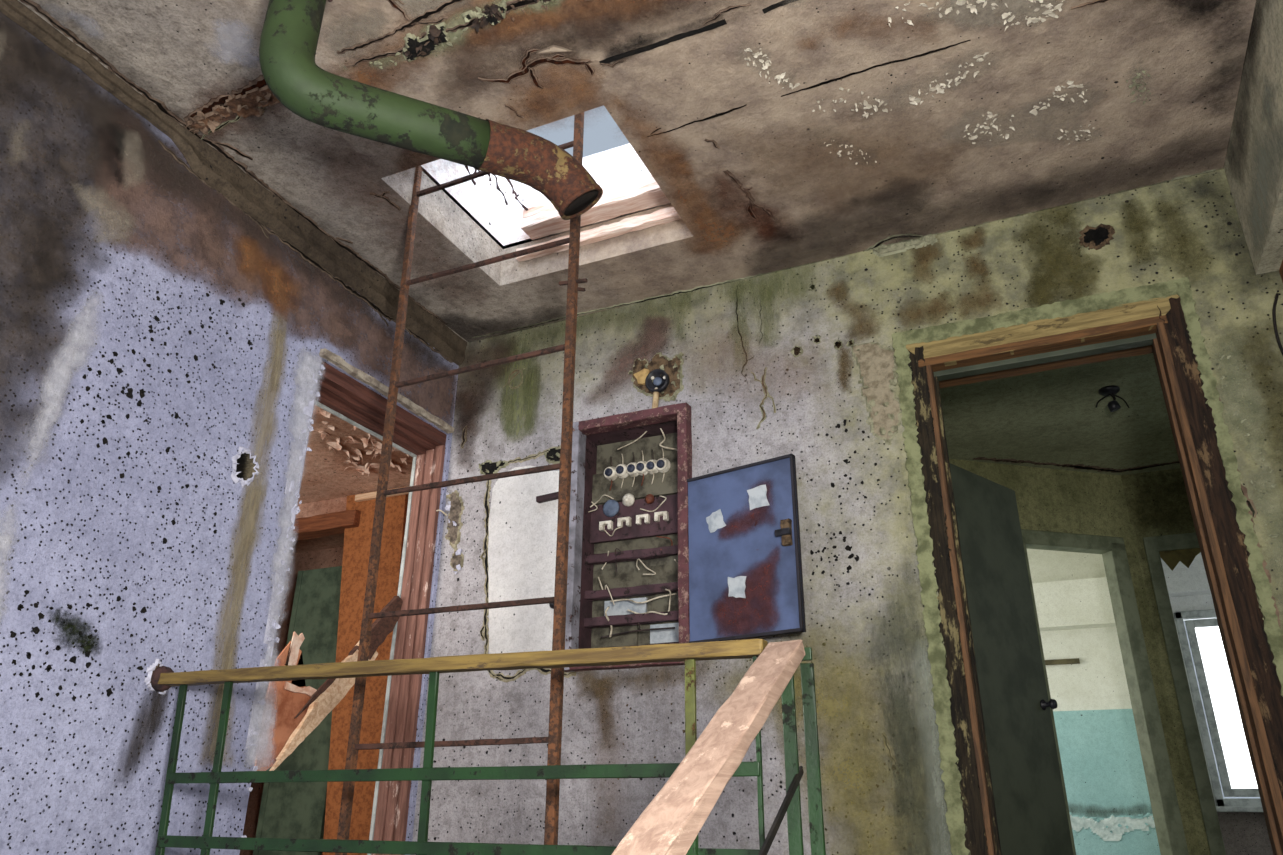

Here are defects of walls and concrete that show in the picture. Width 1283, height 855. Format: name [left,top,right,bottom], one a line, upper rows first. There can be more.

crack [336,0,539,68]
crack [478,47,595,118]
crack [781,40,971,97]
crack [647,104,775,220]
flaking render [188,293,245,340]
damp [901,230,995,323]
damp [963,182,1097,306]
spalling [1079,224,1115,250]
damp [1125,204,1208,274]
damp [0,11,472,774]
spalling [202,447,259,534]
spalling [245,356,409,750]